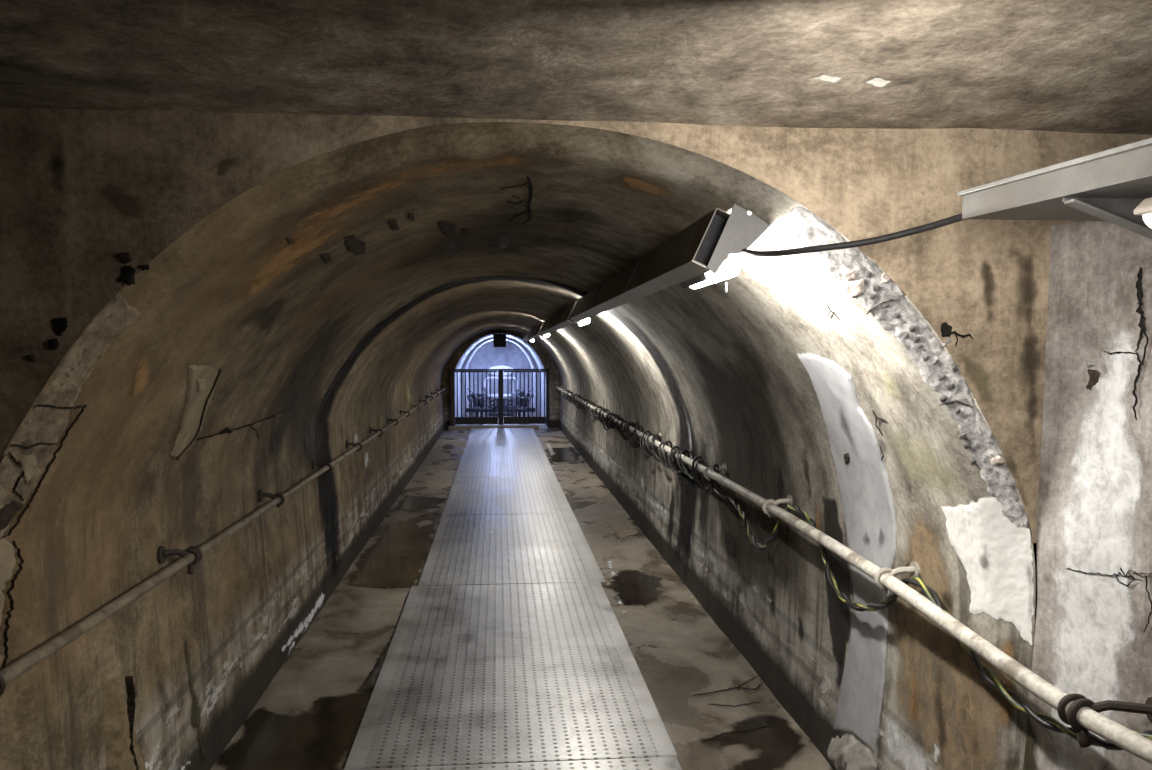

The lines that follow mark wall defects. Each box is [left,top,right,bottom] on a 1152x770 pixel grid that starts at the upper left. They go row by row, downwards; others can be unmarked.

spalling [0,252,150,670]
flaking render [170,364,221,460]
water stain [264,276,587,575]
water stain [574,308,798,612]
water stain [816,497,850,687]
spalling [785,206,1034,646]
crack [1065,567,1152,632]
crack [1104,267,1148,420]